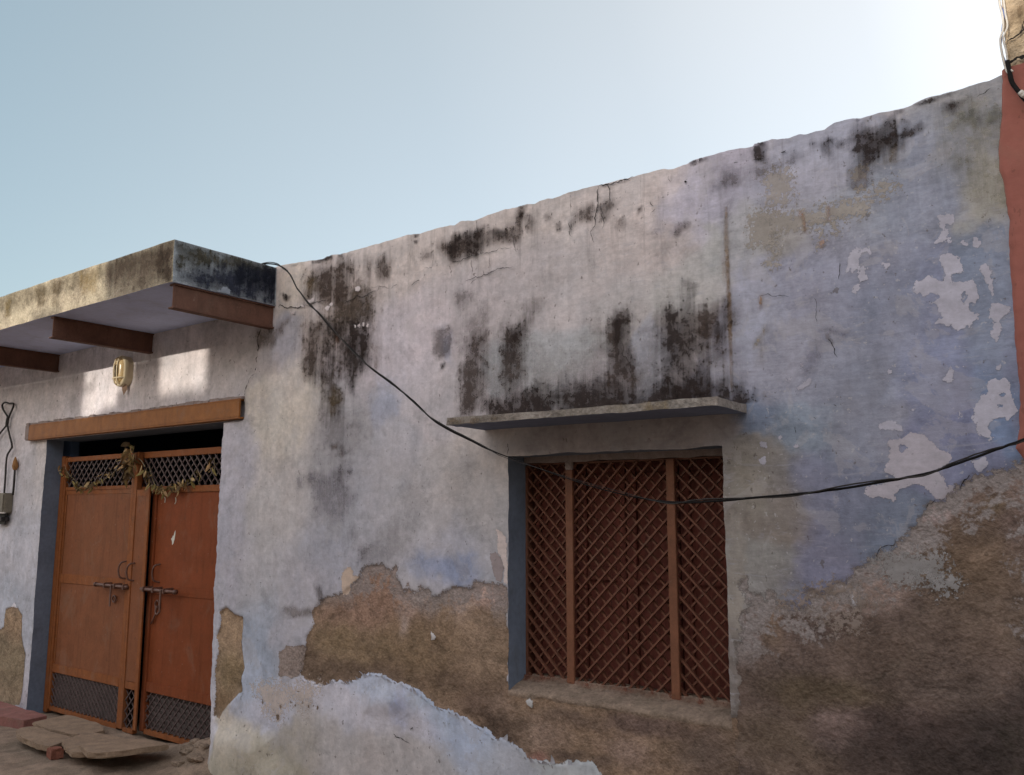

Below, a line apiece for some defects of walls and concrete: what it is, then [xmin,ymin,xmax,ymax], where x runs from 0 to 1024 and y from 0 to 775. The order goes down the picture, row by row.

leakage [852,119,922,166]
leakage [105,242,287,304]
leakage [367,253,390,277]
leakage [441,205,532,262]
crack [551,177,655,240]
peeling [913,214,1011,342]
leakage [302,255,375,415]
leakage [447,299,756,424]
peeling [959,364,1018,441]
spalling [276,419,1024,775]
spalling [0,603,25,705]
spalling [214,608,245,718]